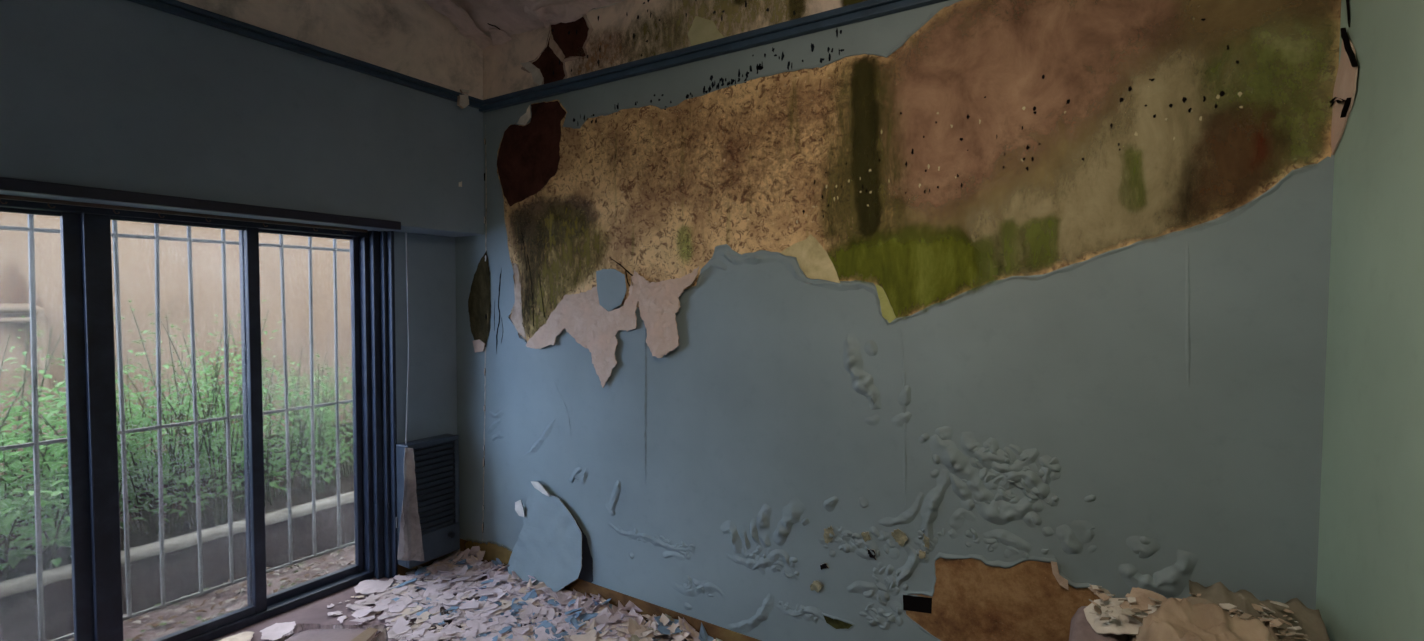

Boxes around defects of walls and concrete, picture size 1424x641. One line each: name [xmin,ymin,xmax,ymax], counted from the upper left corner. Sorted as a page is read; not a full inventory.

flaking render [496,0,1358,388]
damp [614,0,1336,319]
flaking render [468,251,491,353]
damp [510,196,609,336]
flaking render [899,552,1114,641]